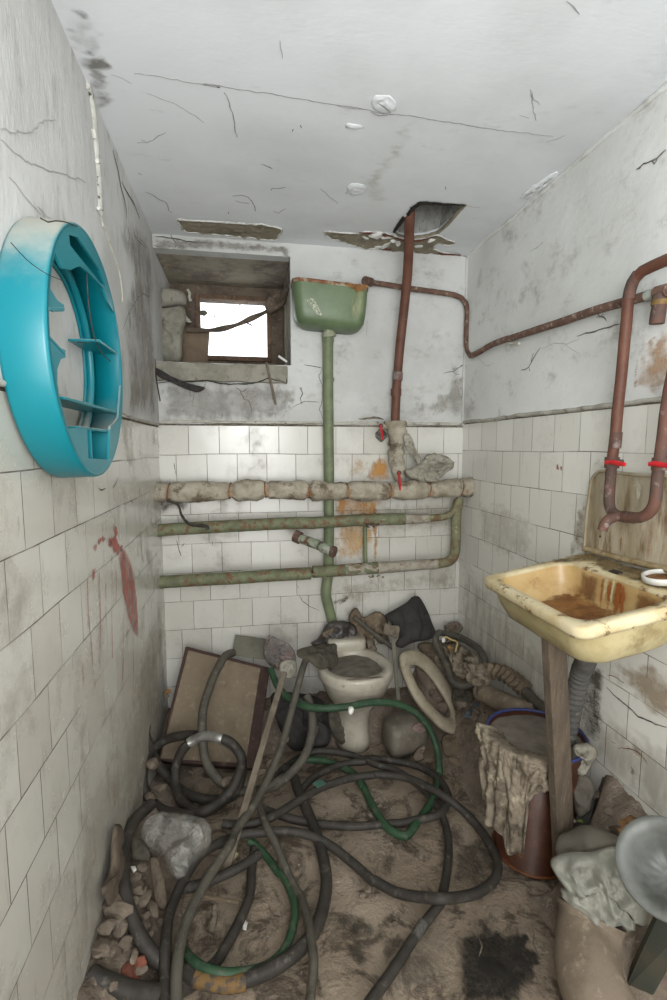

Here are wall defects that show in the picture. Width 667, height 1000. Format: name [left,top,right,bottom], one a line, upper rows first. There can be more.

crack [111,74,565,142]
crack [1,119,86,219]
flaking render [175,218,283,241]
spalling [323,201,462,257]
crack [523,314,619,370]
rust [647,340,667,377]
rust [369,459,386,477]
rust [323,500,439,580]